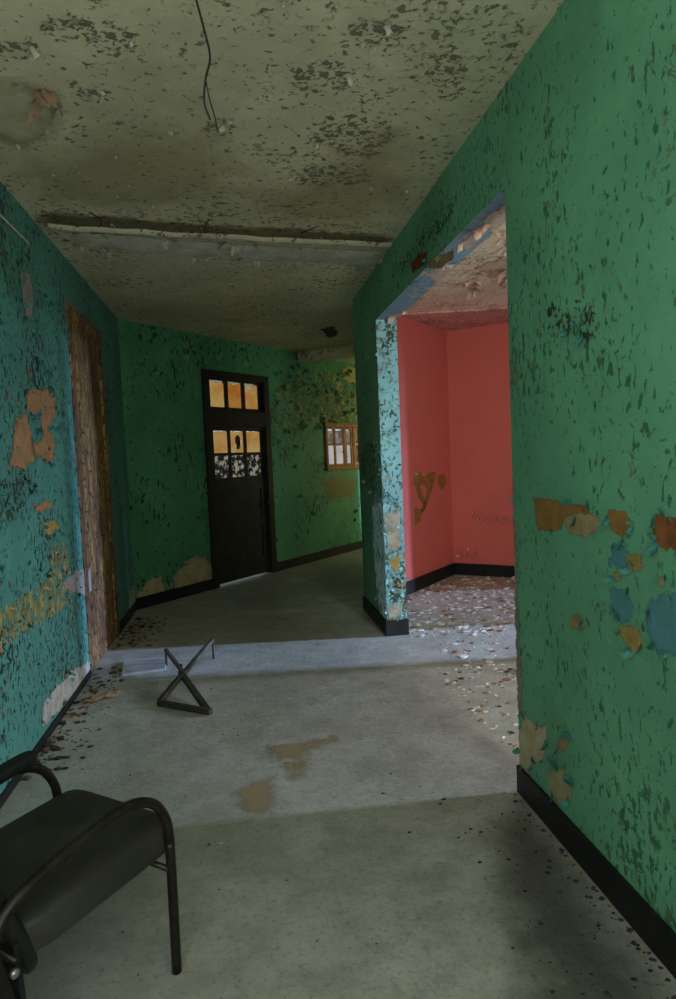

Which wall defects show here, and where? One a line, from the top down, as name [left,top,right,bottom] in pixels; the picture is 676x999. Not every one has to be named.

peeling [391,198,508,308]
peeling [375,308,412,409]
flaking render [0,215,99,726]
flaking render [129,556,212,609]
peeling [351,430,410,621]
flaking render [510,480,574,809]